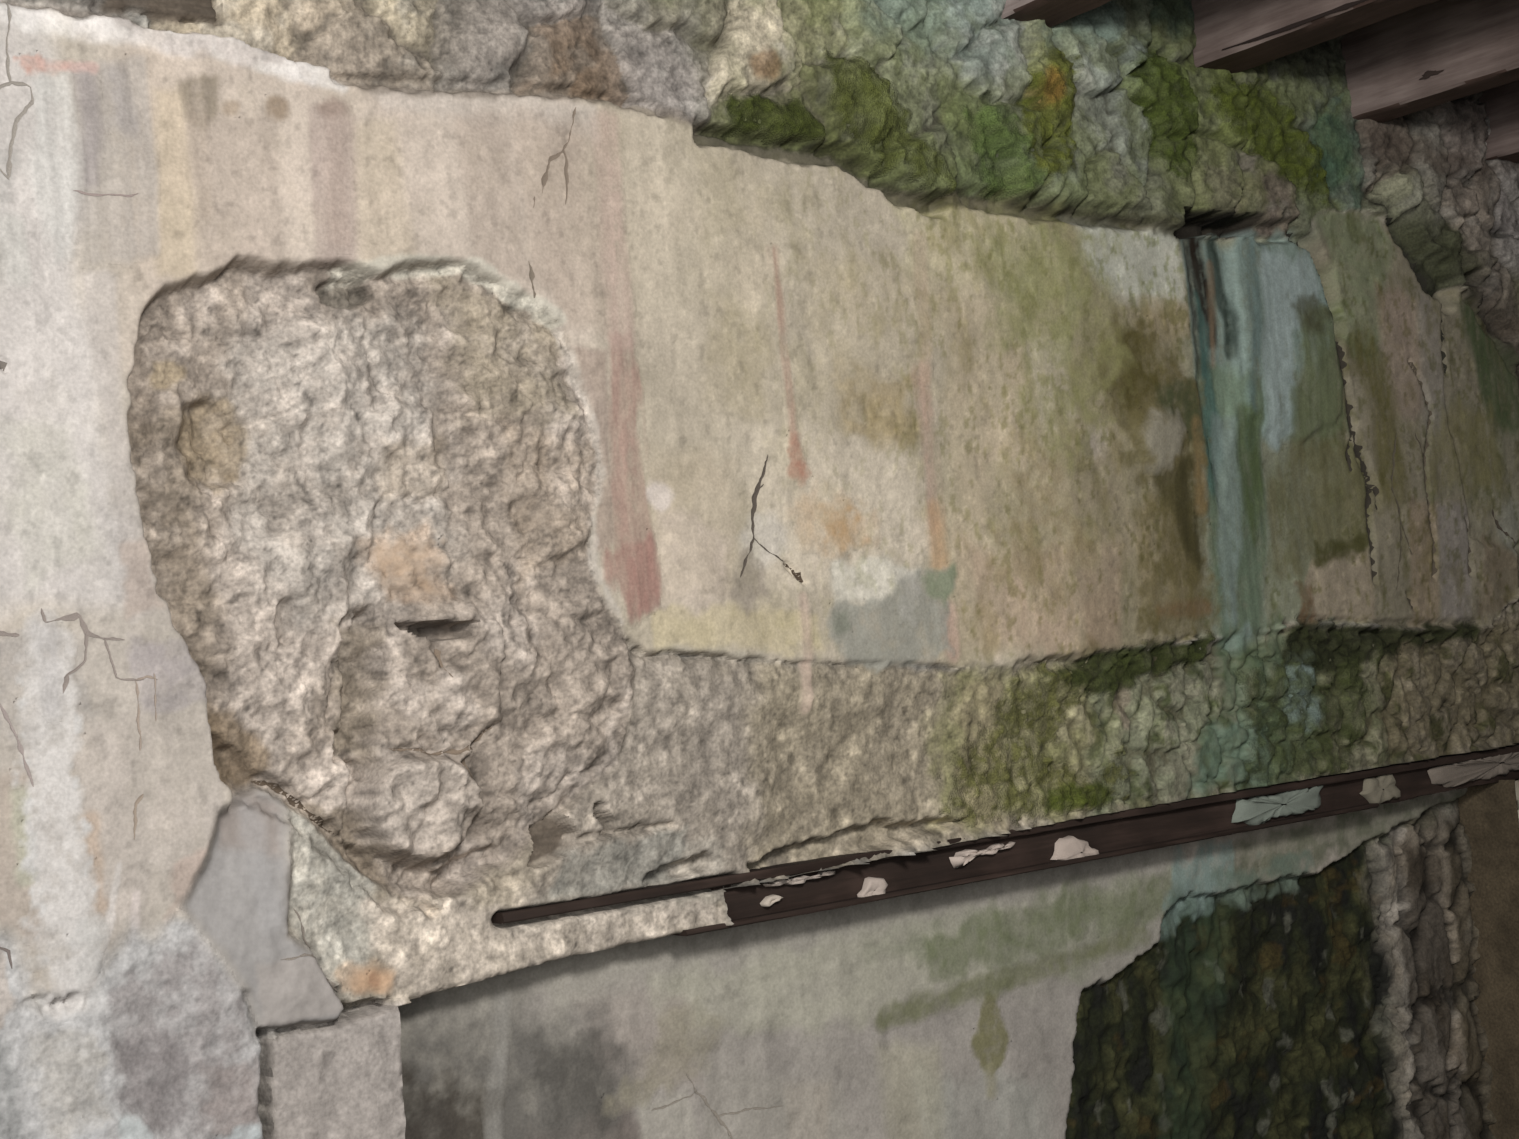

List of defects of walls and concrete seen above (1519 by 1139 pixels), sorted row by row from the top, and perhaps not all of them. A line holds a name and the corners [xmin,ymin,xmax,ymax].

crack [0,3,34,179]
crack [533,107,576,208]
crack [1335,218,1516,590]
crack [740,455,784,577]
damp [1152,225,1327,799]
crack [0,608,158,750]
flaking render [127,260,1301,1007]
flaking render [1334,599,1519,773]
flaking render [1065,943,1165,1139]
flaking render [1206,799,1497,1139]